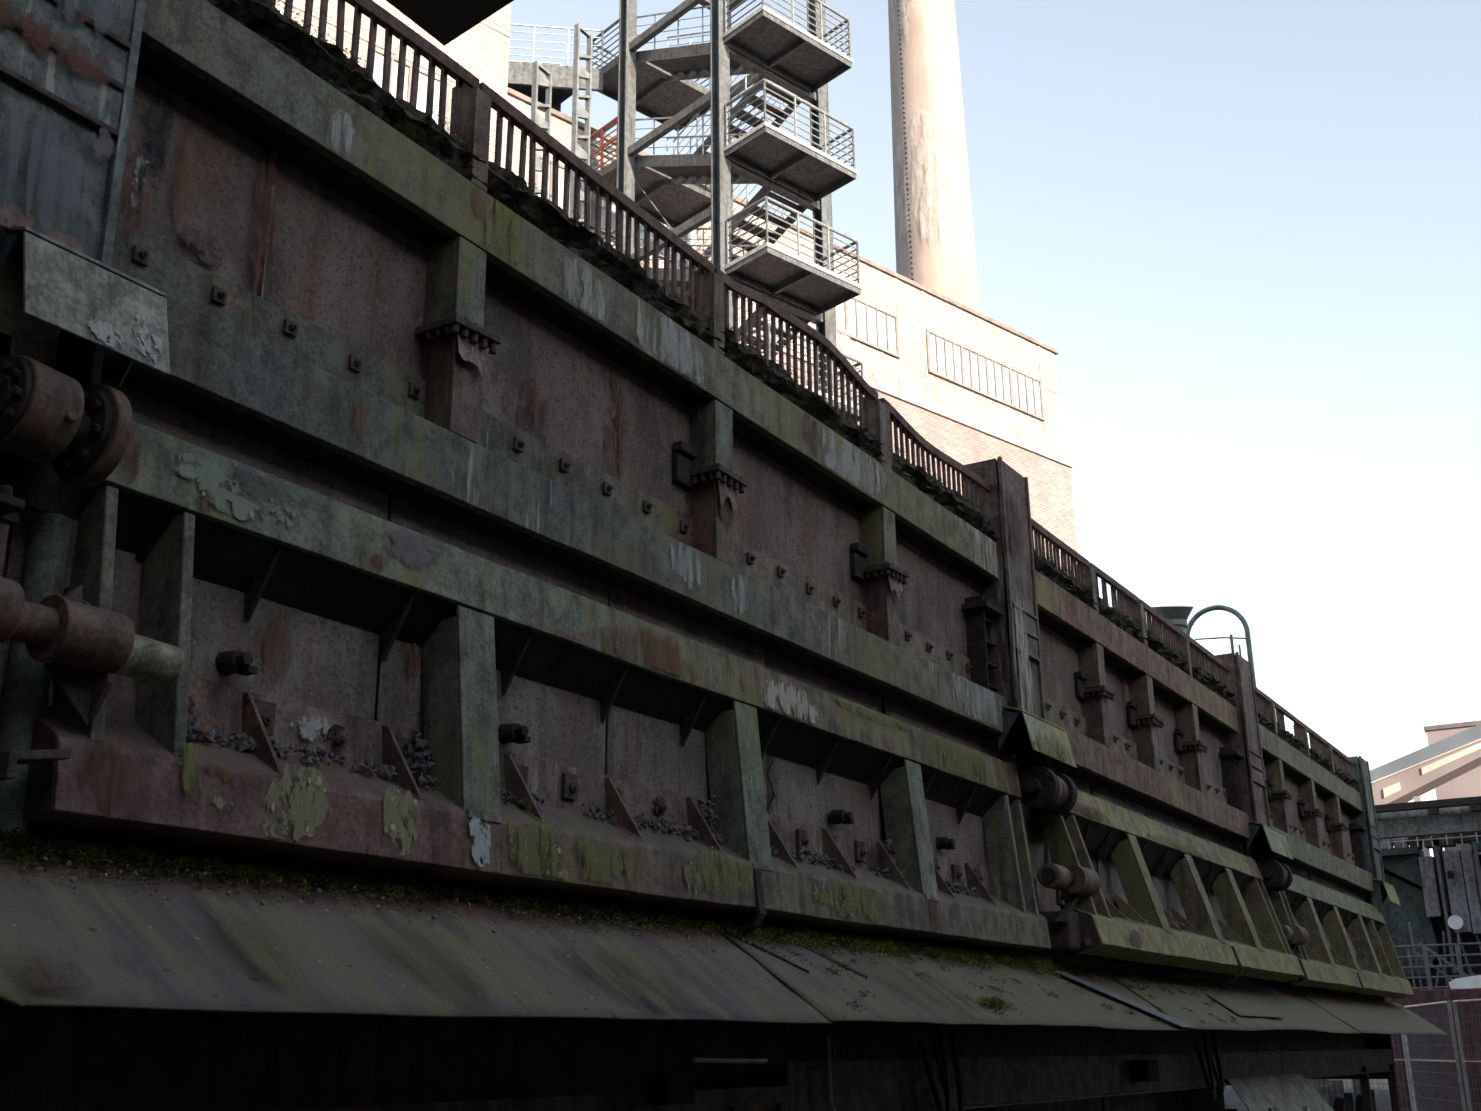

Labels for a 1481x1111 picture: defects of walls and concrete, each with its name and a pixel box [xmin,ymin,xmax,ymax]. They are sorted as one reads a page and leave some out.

peeling [85,313,164,363]
peeling [171,451,300,528]
peeling [761,680,818,724]
peeling [288,714,330,742]
peeling [469,815,491,867]